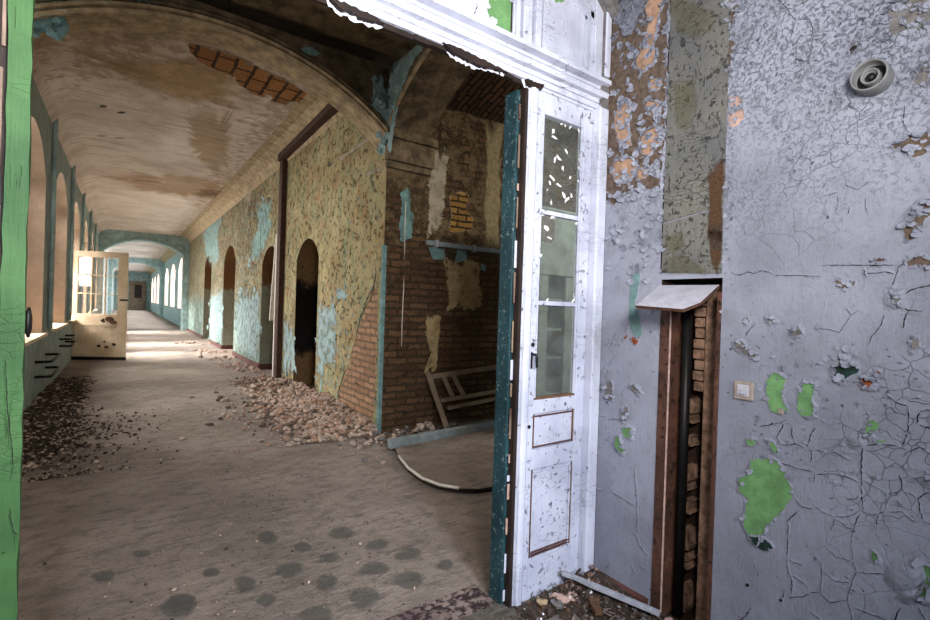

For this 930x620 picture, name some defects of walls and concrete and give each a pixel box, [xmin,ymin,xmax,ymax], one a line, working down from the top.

peeling [486,0,516,32]
flaking render [187,43,308,108]
peeling [605,0,671,346]
peeling [720,0,930,274]
crack [824,182,869,215]
peeling [282,321,297,377]
peeling [314,285,348,391]
flaking render [338,284,380,422]
crack [731,260,930,345]
peeling [730,338,930,554]
crack [759,394,930,620]
crack [734,605,754,620]